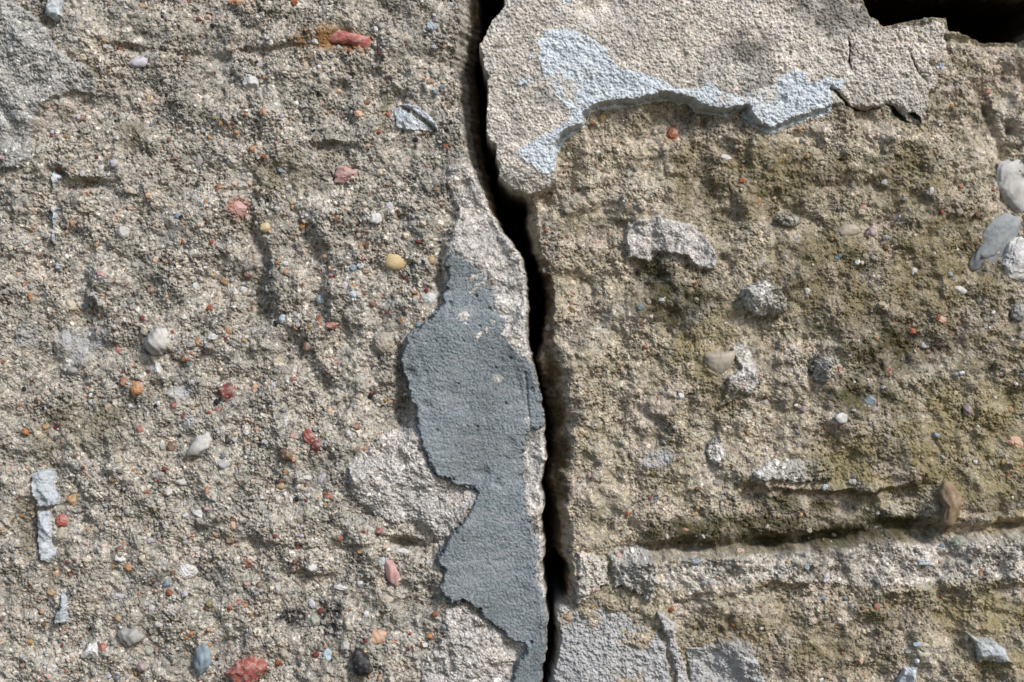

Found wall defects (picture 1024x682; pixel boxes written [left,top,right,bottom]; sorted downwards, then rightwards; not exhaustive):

flaking render [478,0,947,178]
spalling [976,75,1019,161]
crack [464,0,570,677]
peeling [337,163,765,682]
crack [746,478,914,502]
crack [657,529,854,562]
crack [899,528,951,547]